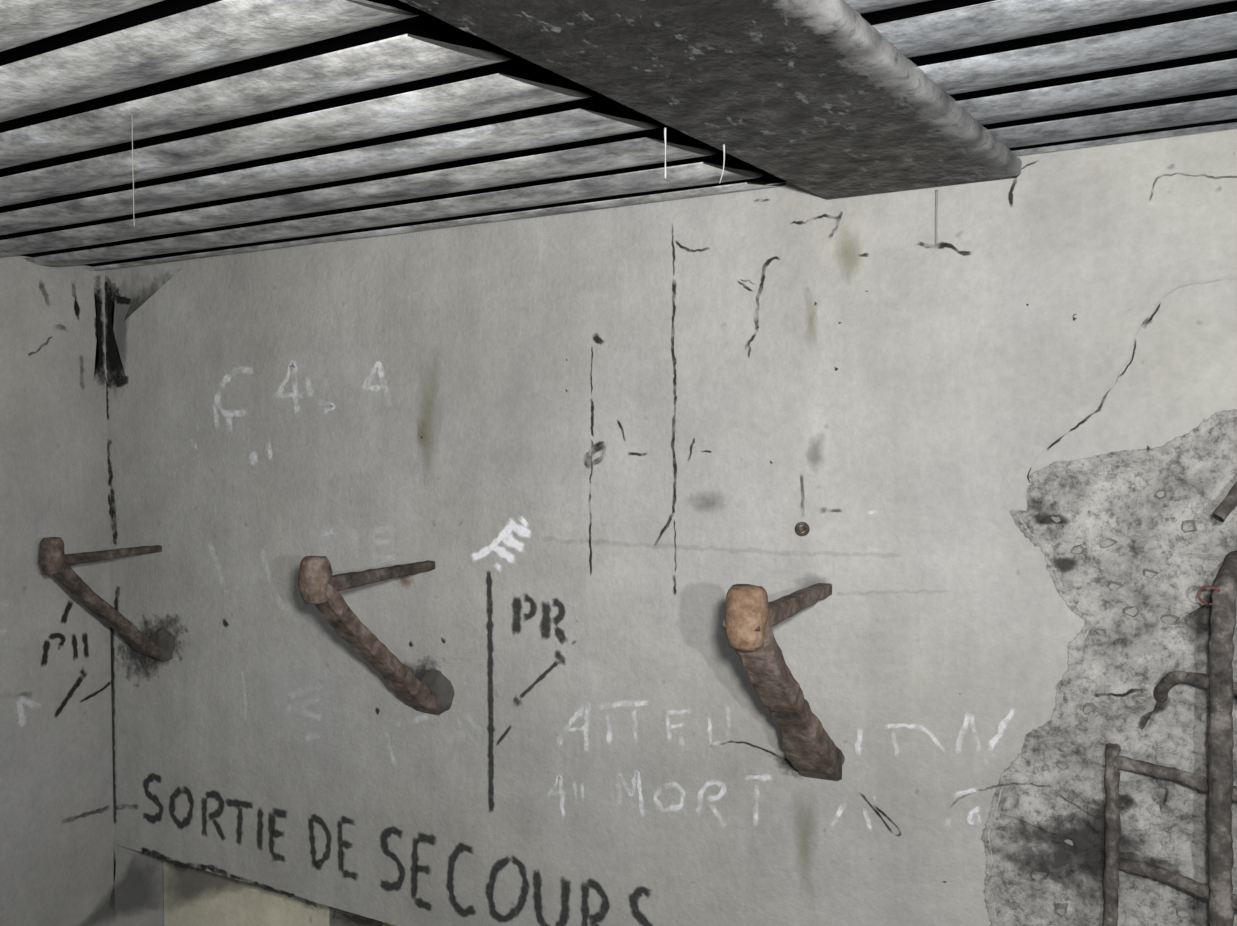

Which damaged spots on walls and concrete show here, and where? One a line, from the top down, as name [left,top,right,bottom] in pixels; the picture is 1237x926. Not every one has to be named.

crack [585,231,711,594]
crack [739,256,779,356]
crack [1027,304,1160,482]
spalling [982,409,1237,926]